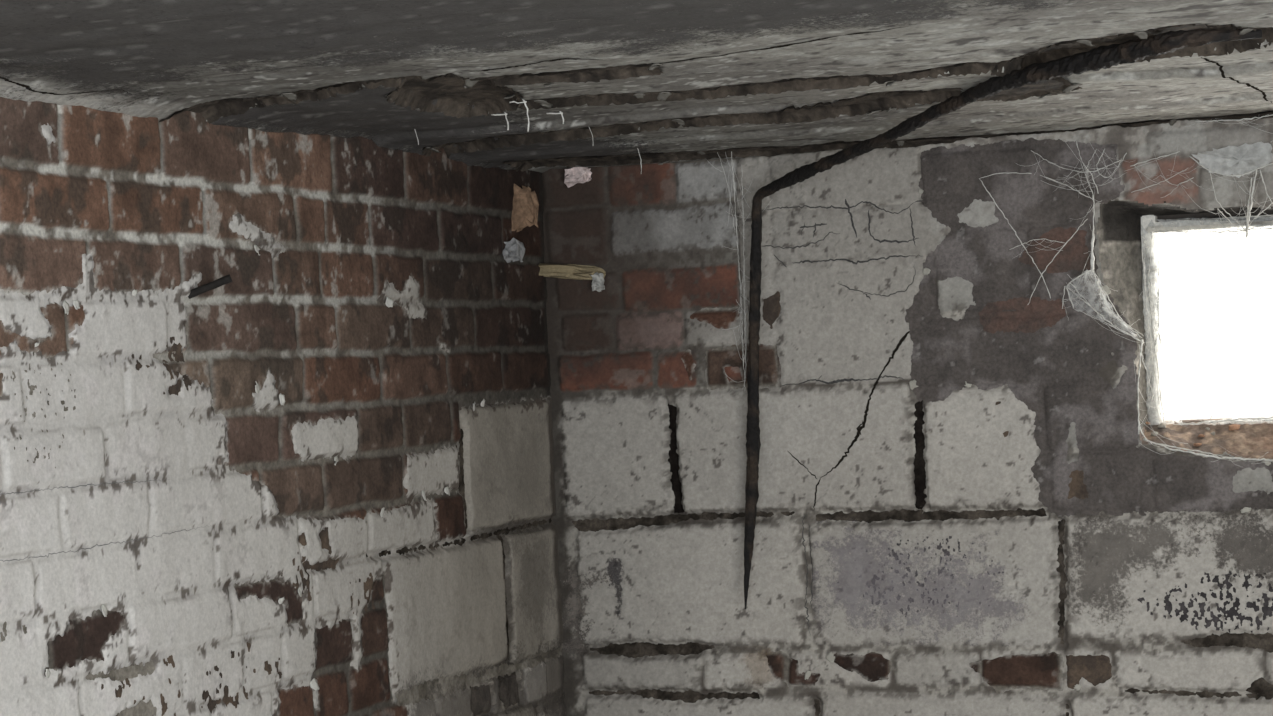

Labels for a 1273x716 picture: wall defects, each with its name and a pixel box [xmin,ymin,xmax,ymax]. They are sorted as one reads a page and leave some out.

crack [470,58,597,72]
crack [659,26,909,64]
crack [1201,57,1272,103]
peeling [0,24,1273,542]
crack [764,199,921,300]
crack [782,331,910,633]
peeling [234,527,339,627]
water stain [1062,508,1273,633]
peeling [44,604,181,716]
spalling [201,666,248,713]
peeling [231,573,563,716]